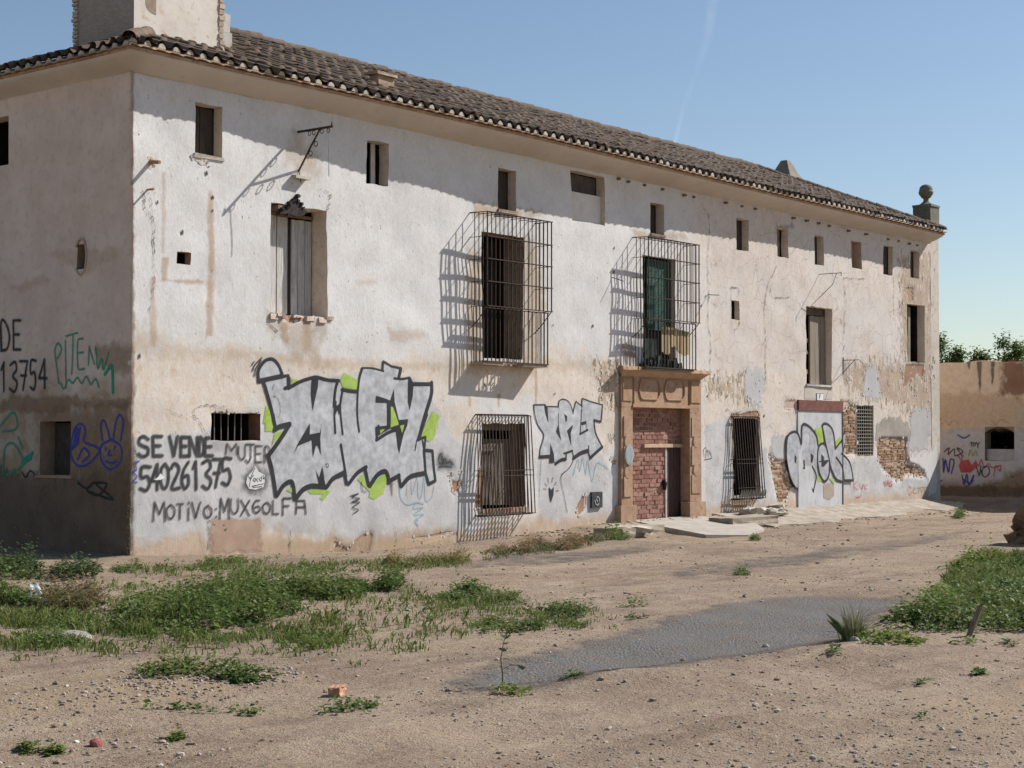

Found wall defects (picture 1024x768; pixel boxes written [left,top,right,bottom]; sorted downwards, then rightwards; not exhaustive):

crack [707,224,789,380]
flaking render [840,252,936,457]
leakage [967,361,994,387]
flaking render [768,453,794,504]
flaking render [876,436,927,482]